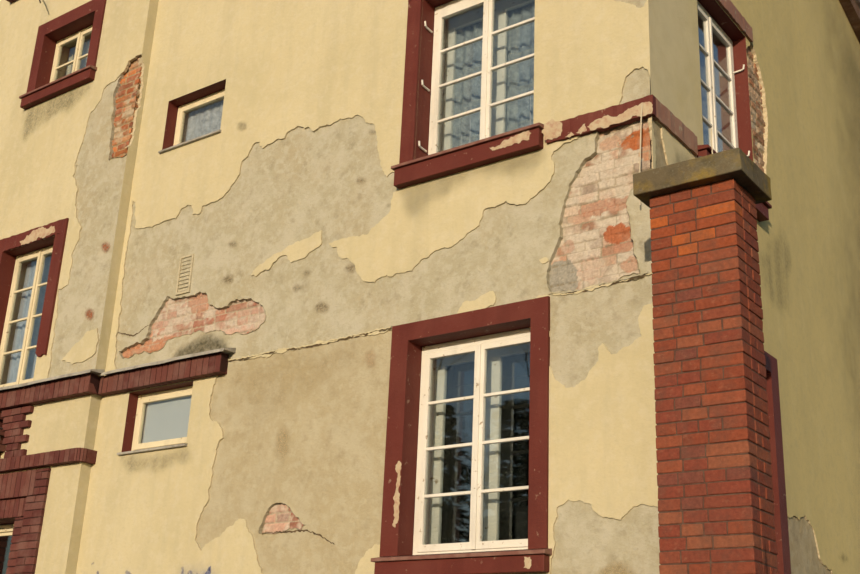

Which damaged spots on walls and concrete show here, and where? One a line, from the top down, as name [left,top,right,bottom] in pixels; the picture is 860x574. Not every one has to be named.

peeling [47,54,145,378]
peeling [114,66,669,574]
flaking render [743,43,768,175]
peeling [787,515,833,574]